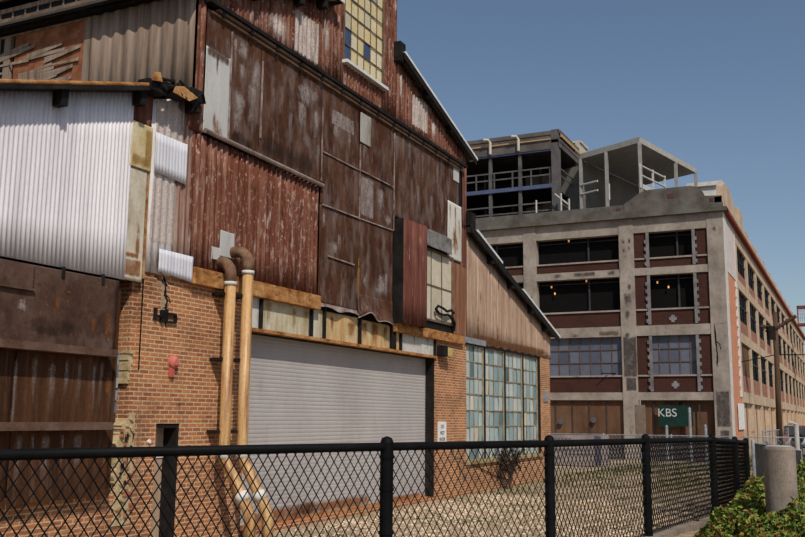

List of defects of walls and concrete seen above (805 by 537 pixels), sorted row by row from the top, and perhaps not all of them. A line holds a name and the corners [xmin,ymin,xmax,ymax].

crack [156,275,171,327]
spalling [112,413,136,447]
spalling [110,457,133,527]